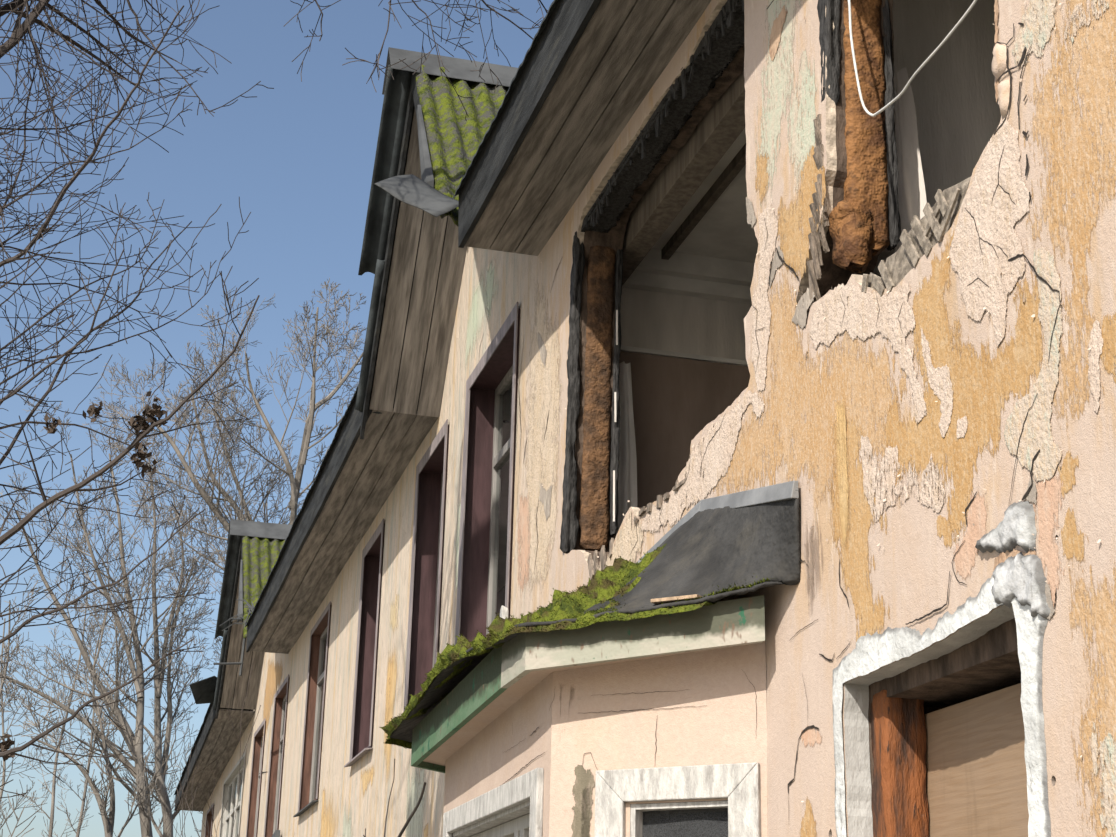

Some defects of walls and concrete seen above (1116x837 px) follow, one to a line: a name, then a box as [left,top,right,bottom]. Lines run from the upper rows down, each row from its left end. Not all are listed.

crack [965,22,1060,362]
peeling [517,0,1116,837]
crack [1009,395,1040,501]
crack [906,491,977,625]
crack [788,681,819,808]